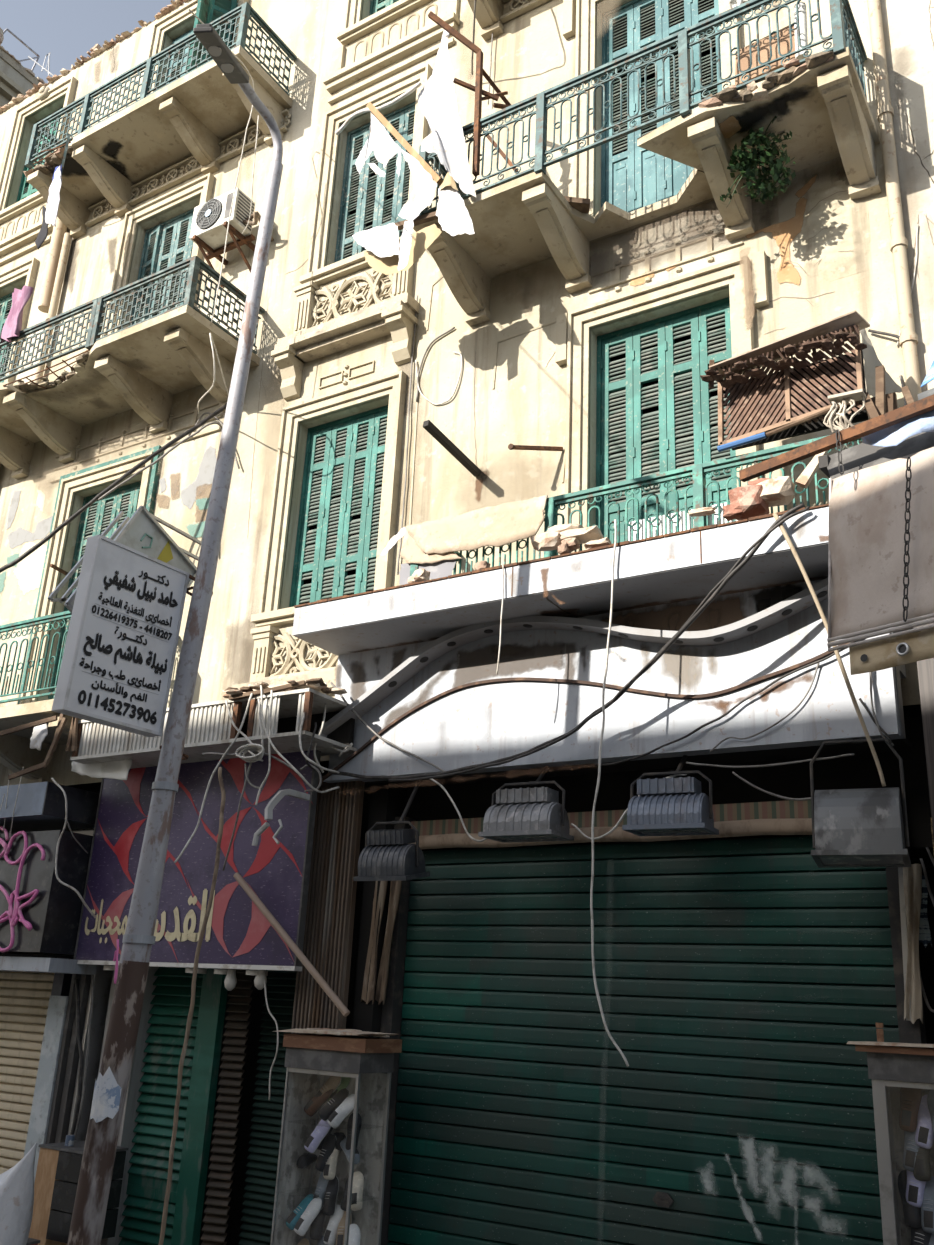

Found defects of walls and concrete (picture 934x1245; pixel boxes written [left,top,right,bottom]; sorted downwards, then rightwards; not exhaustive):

spalling [698,51,835,138]
leakage [735,88,812,133]
crack [906,114,934,184]
peeling [740,175,817,329]
crack [910,214,934,281]
peeling [156,446,216,538]
peeling [0,489,53,595]